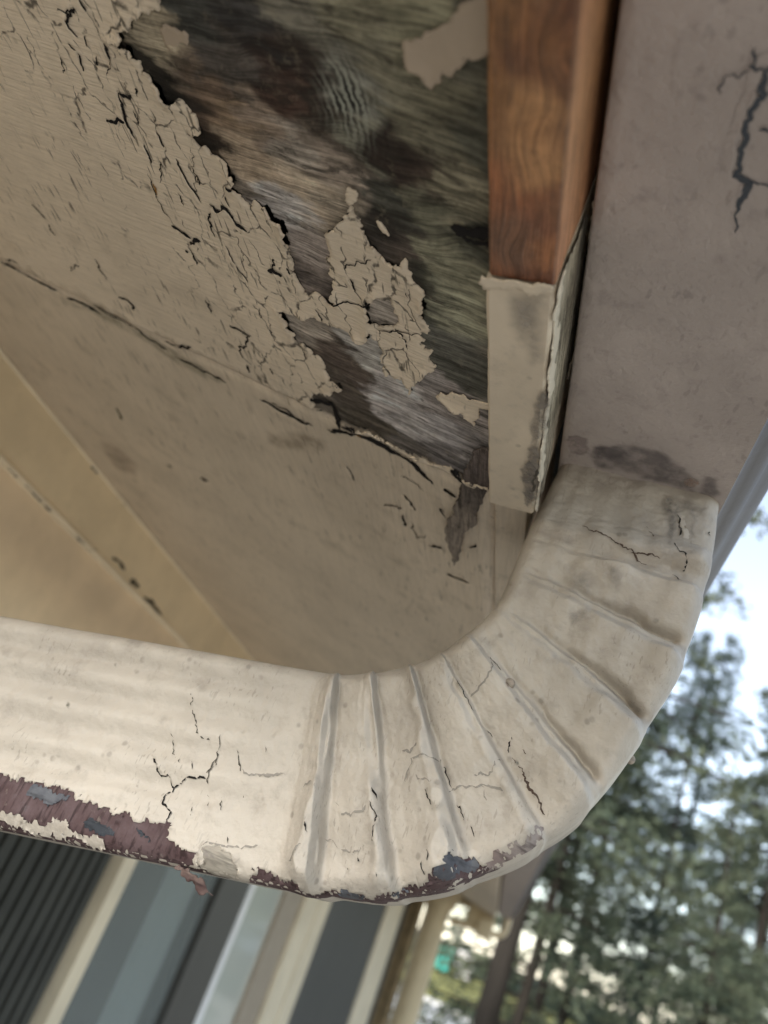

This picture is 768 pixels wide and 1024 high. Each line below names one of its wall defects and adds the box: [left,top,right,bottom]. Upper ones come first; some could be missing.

crack [57,0,307,374]
crack [717,48,768,233]
peeling [119,0,594,512]
crack [0,259,225,383]
crack [384,475,446,549]
crack [447,574,472,586]
crack [585,515,710,579]
crack [457,657,501,711]
crack [151,694,311,822]
peeling [0,767,544,904]
crack [402,732,545,835]